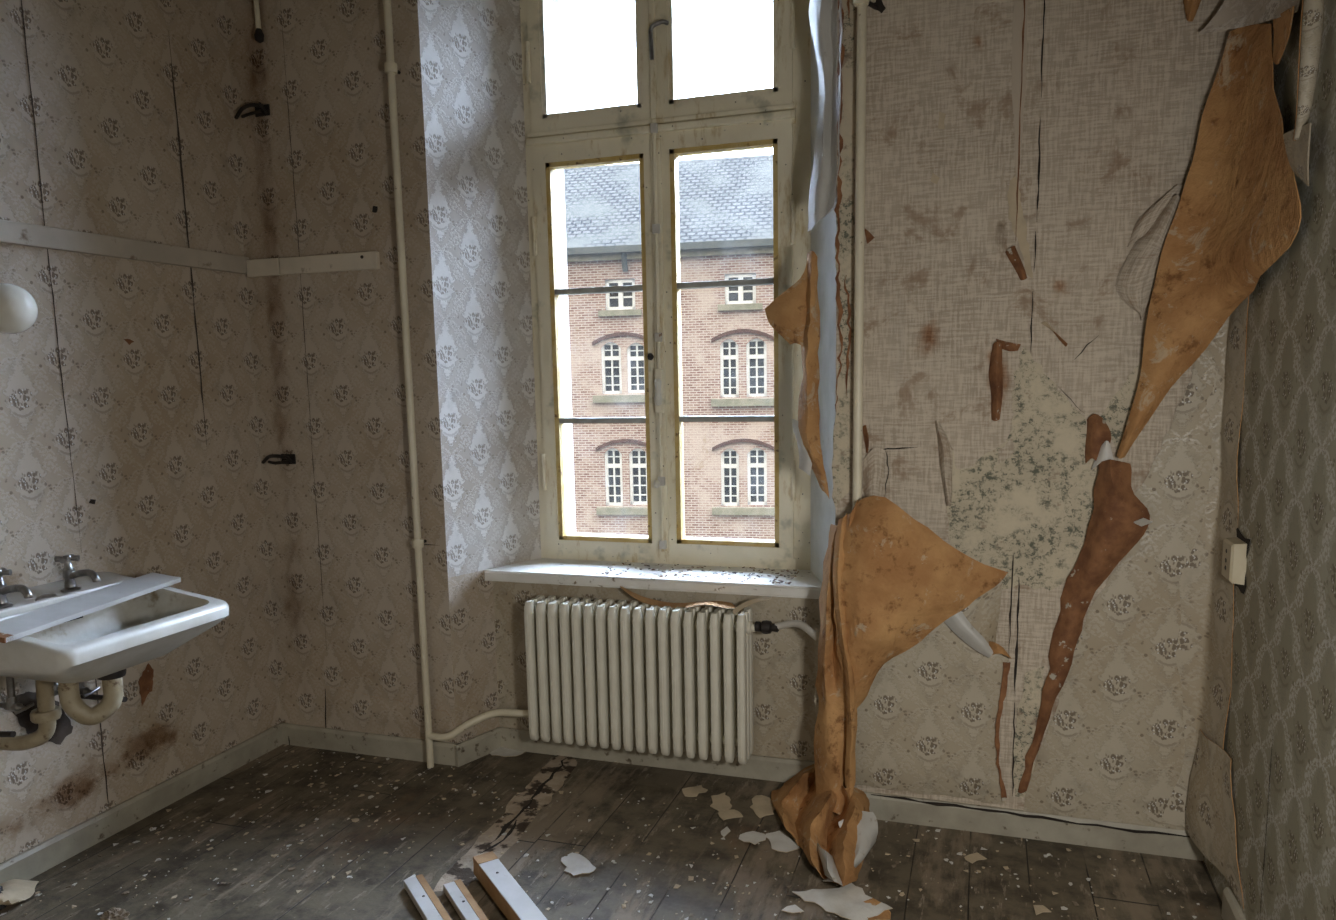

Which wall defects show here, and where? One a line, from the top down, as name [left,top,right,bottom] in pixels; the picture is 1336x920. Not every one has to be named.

peeling [832,0,886,507]
damp [945,347,1141,591]
spalling [1236,528,1250,558]